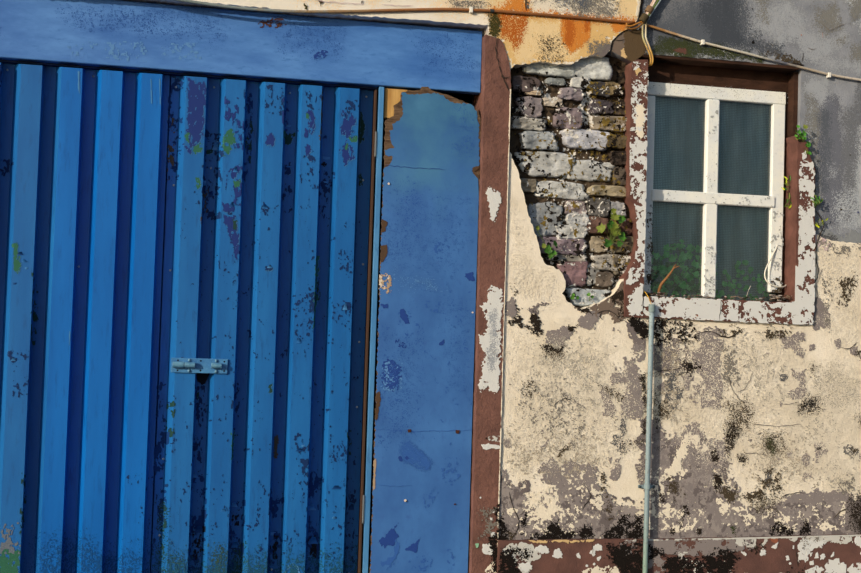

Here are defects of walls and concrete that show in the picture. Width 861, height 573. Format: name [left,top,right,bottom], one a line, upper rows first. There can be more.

leakage [287,0,355,15]
corrosion [487,0,637,55]
leakage [414,0,861,258]
leakage [795,391,826,417]
leakage [476,324,820,573]
mould [836,474,861,534]